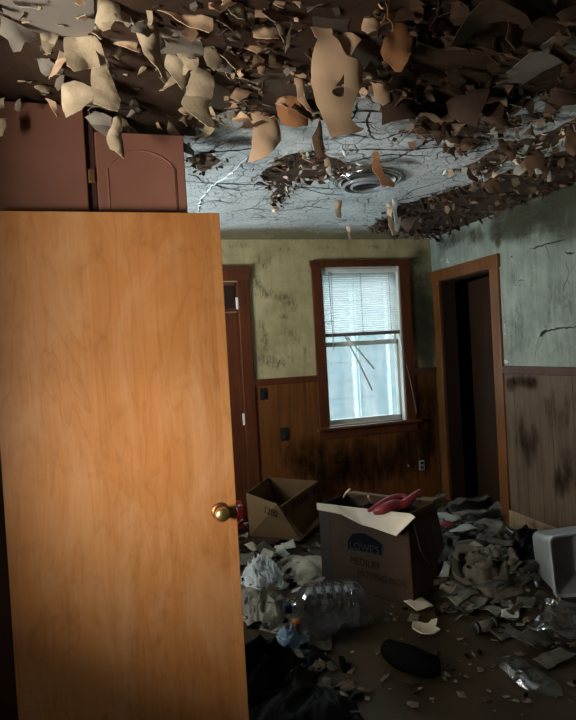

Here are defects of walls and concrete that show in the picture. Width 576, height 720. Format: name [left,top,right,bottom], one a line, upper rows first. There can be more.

peeling [0,0,576,242]
crack [344,101,451,163]
crack [186,143,345,213]
crack [529,239,575,288]
crack [535,326,576,353]